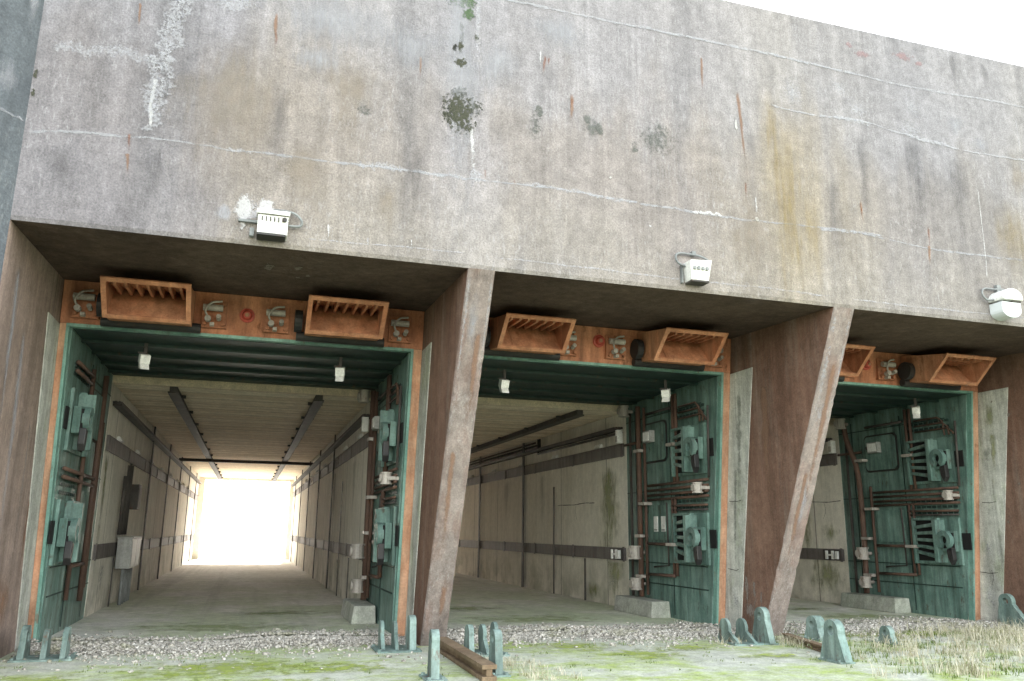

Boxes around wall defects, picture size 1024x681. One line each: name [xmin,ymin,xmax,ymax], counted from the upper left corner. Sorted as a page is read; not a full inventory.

crack [508,0,1024,108]
water stain [219,195,274,229]
crack [32,79,1024,274]